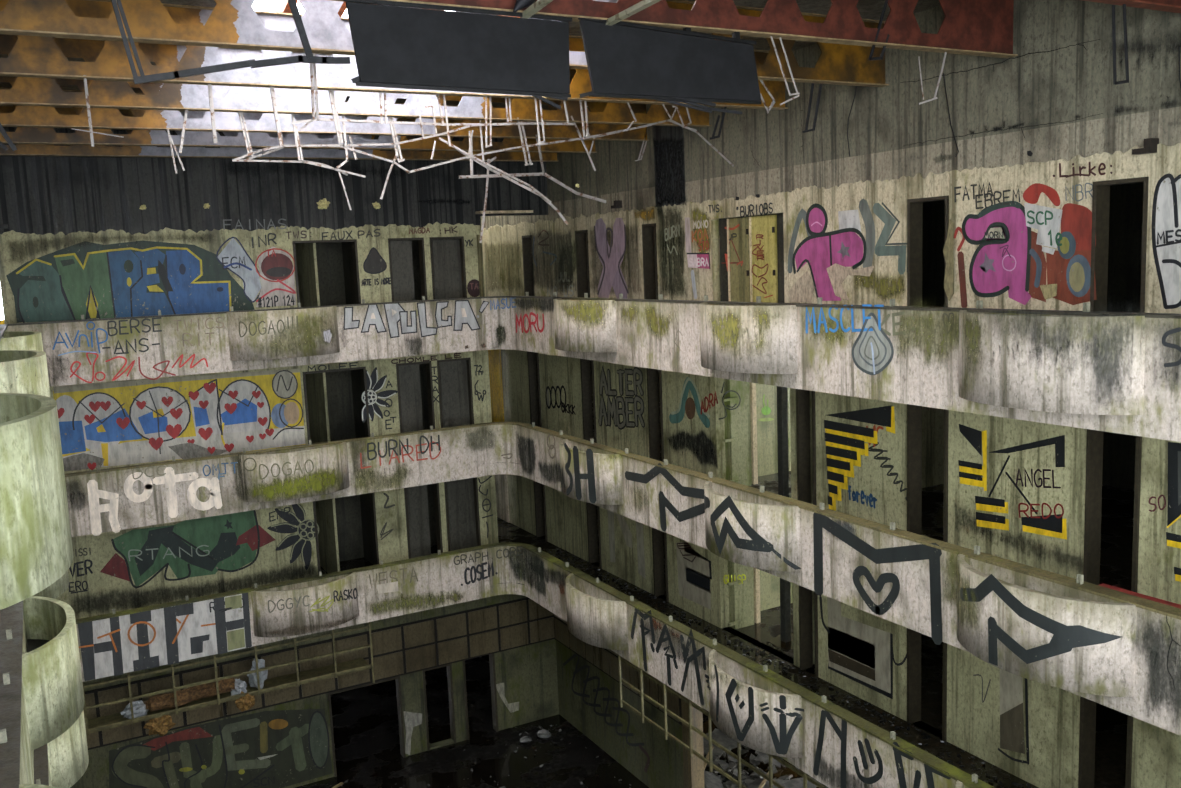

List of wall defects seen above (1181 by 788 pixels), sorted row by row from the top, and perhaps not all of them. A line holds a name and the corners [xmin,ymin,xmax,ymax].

water stain [1013,315,1070,355]
water stain [1085,329,1128,398]
water stain [1135,621,1181,717]